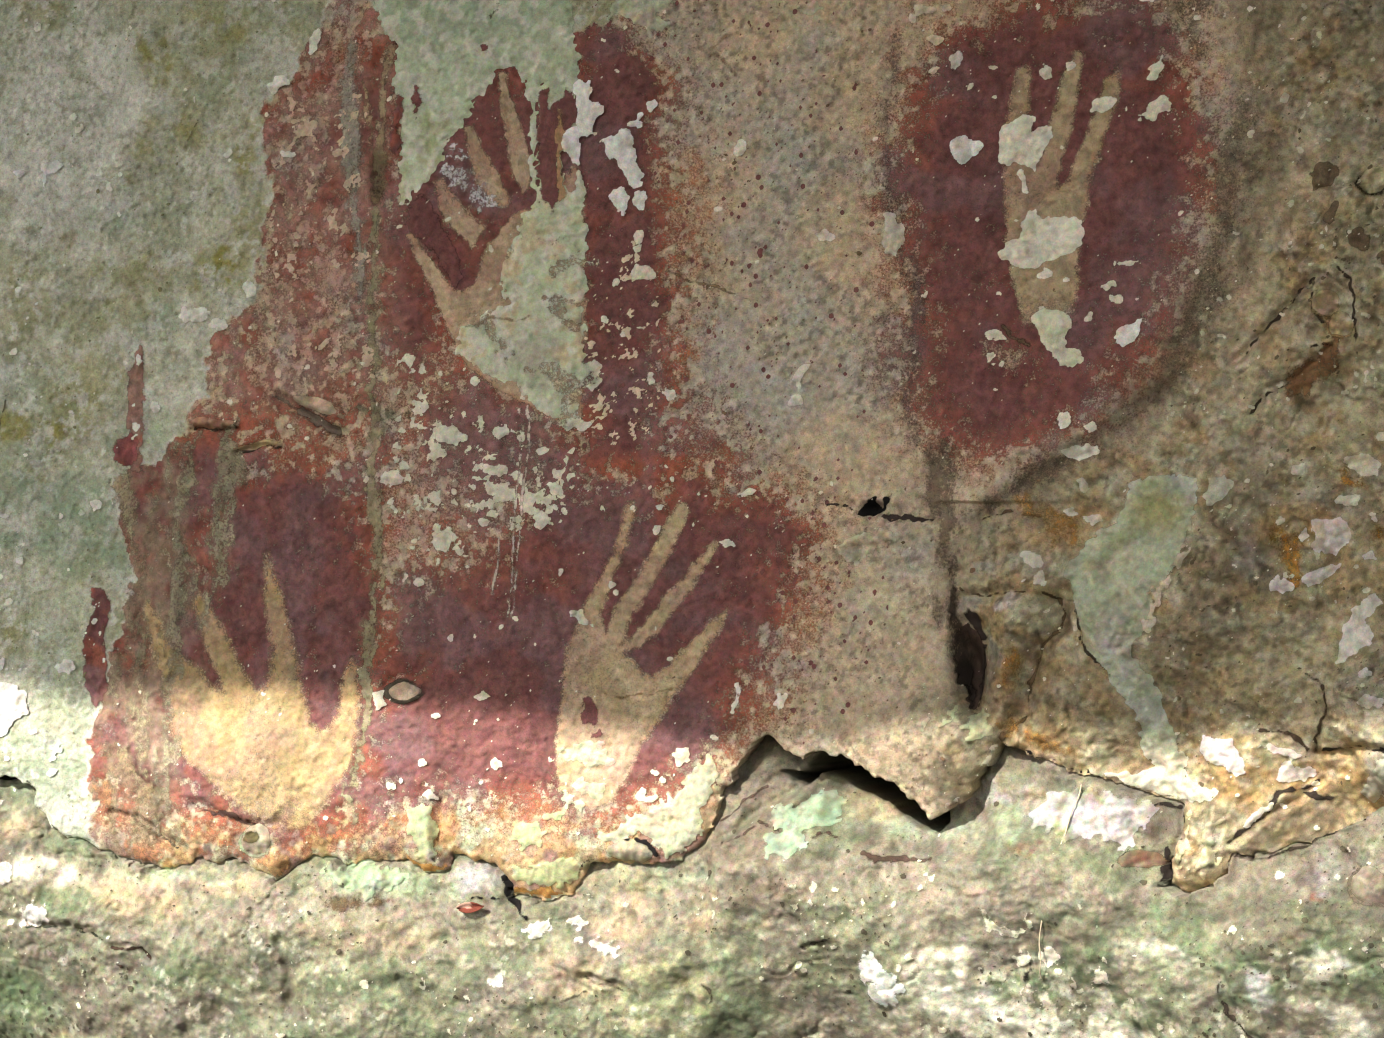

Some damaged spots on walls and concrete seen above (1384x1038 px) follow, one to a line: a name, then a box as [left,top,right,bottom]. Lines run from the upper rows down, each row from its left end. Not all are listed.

peeling [561,79,658,216]
peeling [949,114,1085,282]
peeling [1101,260,1141,304]
spalling [572,230,677,445]
peeling [1031,308,1093,367]
peeling [1114,319,1142,347]
spalling [363,337,580,584]
peeling [372,690,387,711]
crack [1227,673,1384,861]
crack [0,775,55,828]
crack [720,785,774,844]
crack [812,831,932,864]